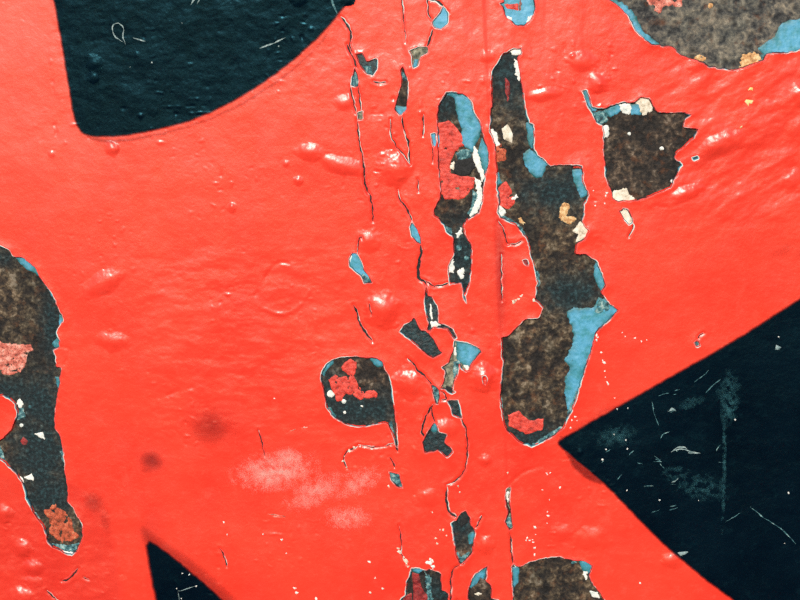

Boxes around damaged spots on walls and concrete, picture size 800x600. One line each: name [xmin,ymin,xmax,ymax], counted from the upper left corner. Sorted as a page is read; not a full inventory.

crack [341,17,358,68]
peeling [607,0,800,72]
crack [350,81,386,253]
crack [389,114,435,221]
peeling [581,89,700,226]
crack [417,245,448,287]
peeling [430,47,620,448]
peeling [0,245,84,557]
peeling [319,355,399,448]
crack [407,358,447,437]
crack [445,419,470,517]
peeling [510,556,605,600]